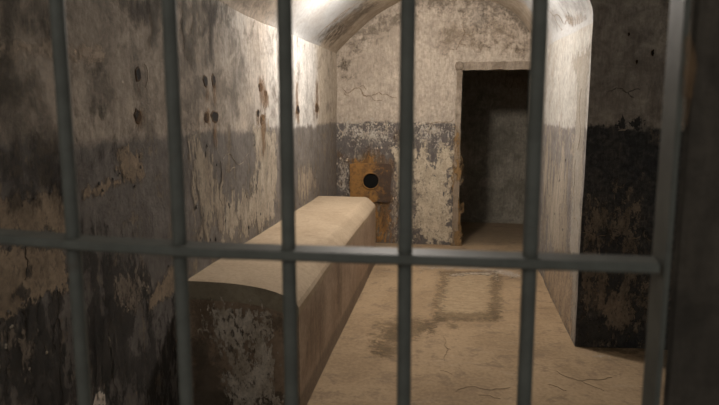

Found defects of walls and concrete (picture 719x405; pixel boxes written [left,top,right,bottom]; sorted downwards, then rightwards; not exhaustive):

corrosion [257,78,269,156]
peeling [336,112,399,242]
crack [342,85,394,101]
peeling [412,113,462,244]
corrosion [451,126,464,191]
water stain [0,266,78,405]
water stain [82,251,180,405]
flaking render [197,293,285,405]